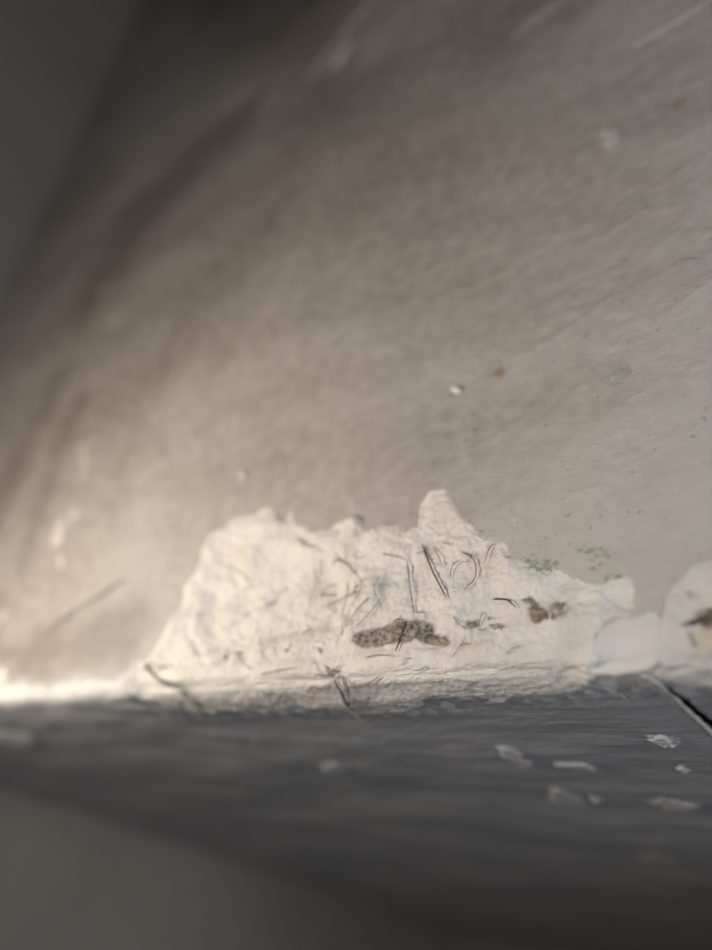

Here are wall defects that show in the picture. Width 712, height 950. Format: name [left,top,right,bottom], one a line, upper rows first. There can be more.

flaking render [0,487,712,748]